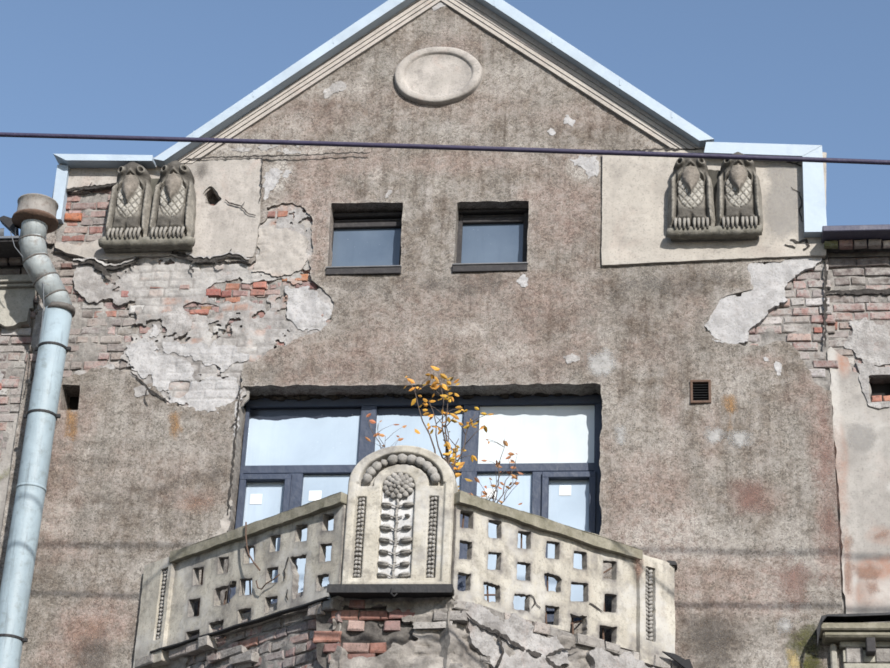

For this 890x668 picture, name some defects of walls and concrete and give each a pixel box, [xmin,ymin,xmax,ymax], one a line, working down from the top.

crack [183,152,370,216]
flaking render [570,155,600,179]
spalling [25,294,45,381]
spalling [46,168,334,437]
flaking render [704,257,838,390]
crack [785,187,890,347]
flaking render [465,602,570,668]
flaking render [586,647,655,668]